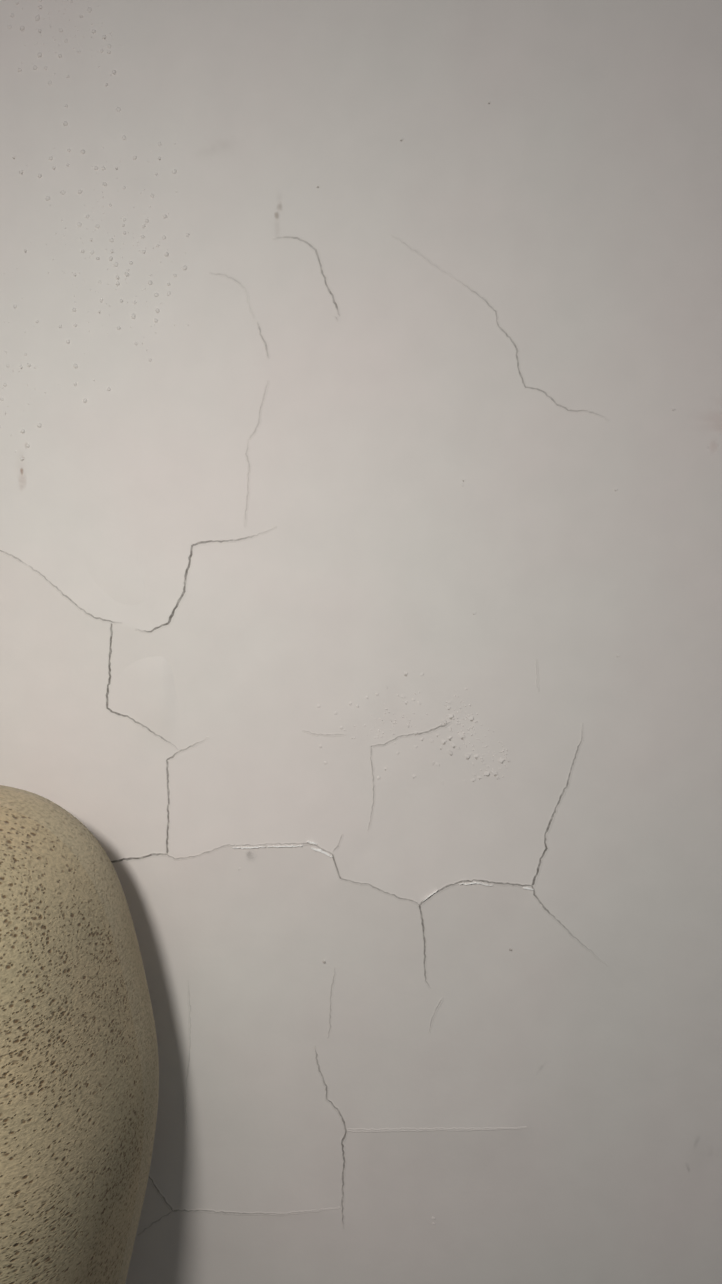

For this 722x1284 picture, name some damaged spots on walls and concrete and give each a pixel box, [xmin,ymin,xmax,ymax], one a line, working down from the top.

crack [272,235,341,322]
crack [390,234,610,422]
crack [0,271,609,1034]
crack [314,967,527,1229]